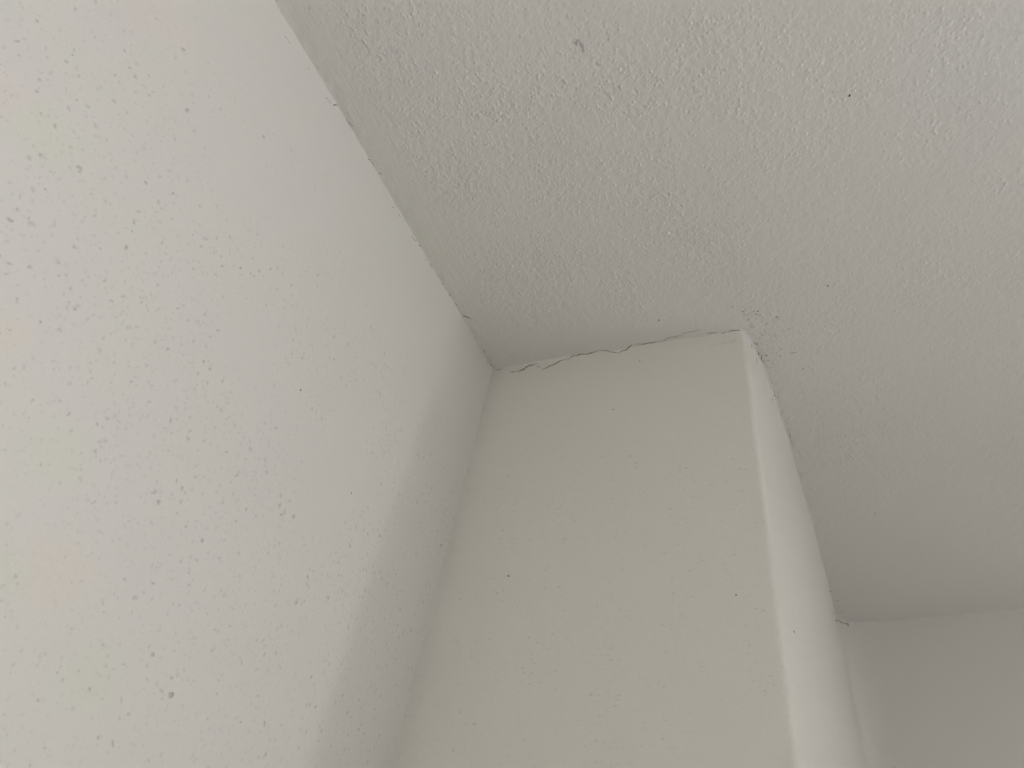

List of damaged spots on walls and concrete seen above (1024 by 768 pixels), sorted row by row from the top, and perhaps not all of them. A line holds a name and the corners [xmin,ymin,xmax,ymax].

crack [497,329,748,373]